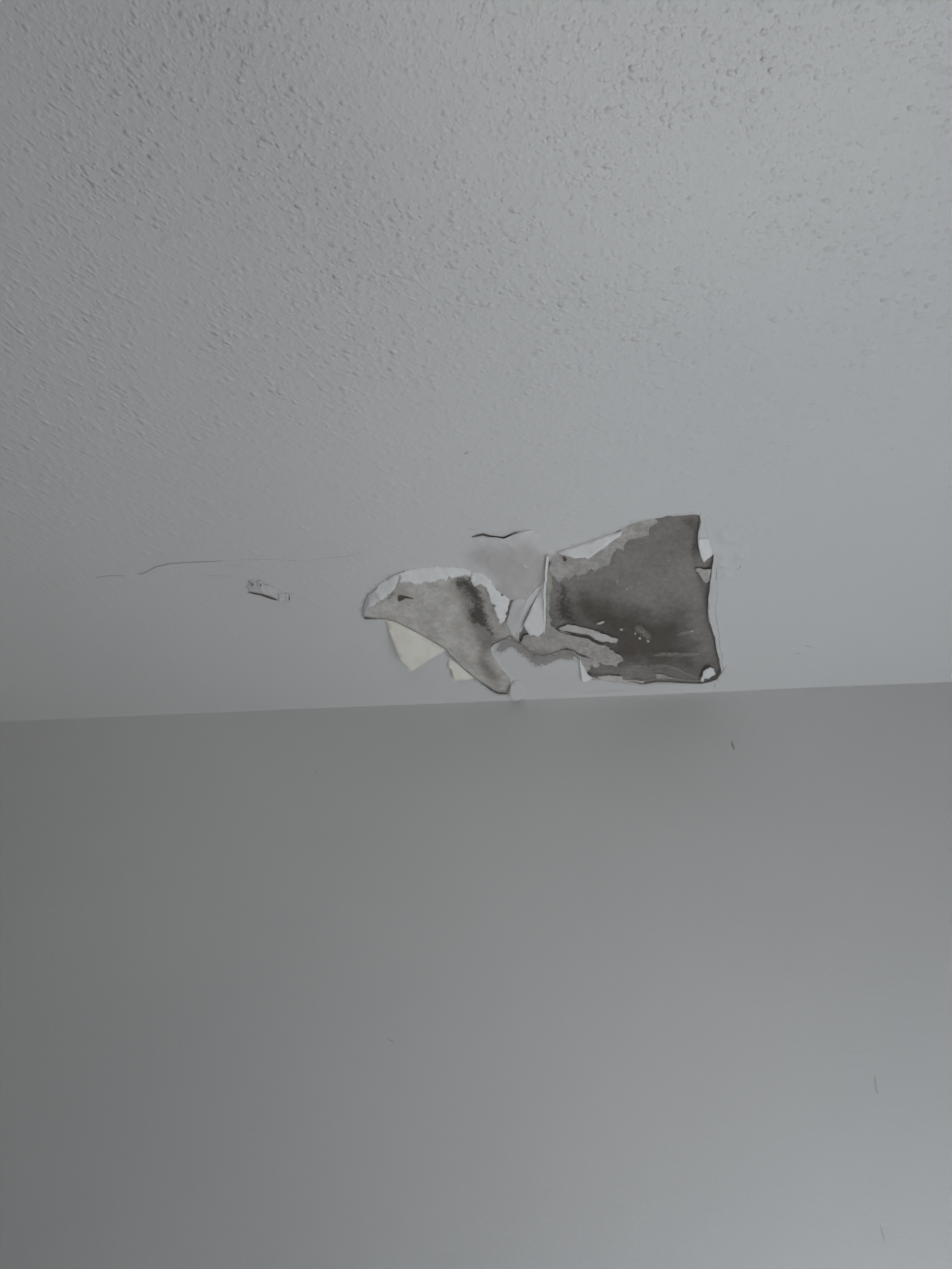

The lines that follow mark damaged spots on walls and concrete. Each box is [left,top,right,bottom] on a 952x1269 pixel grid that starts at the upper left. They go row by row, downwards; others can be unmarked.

peeling [362,512,724,701]